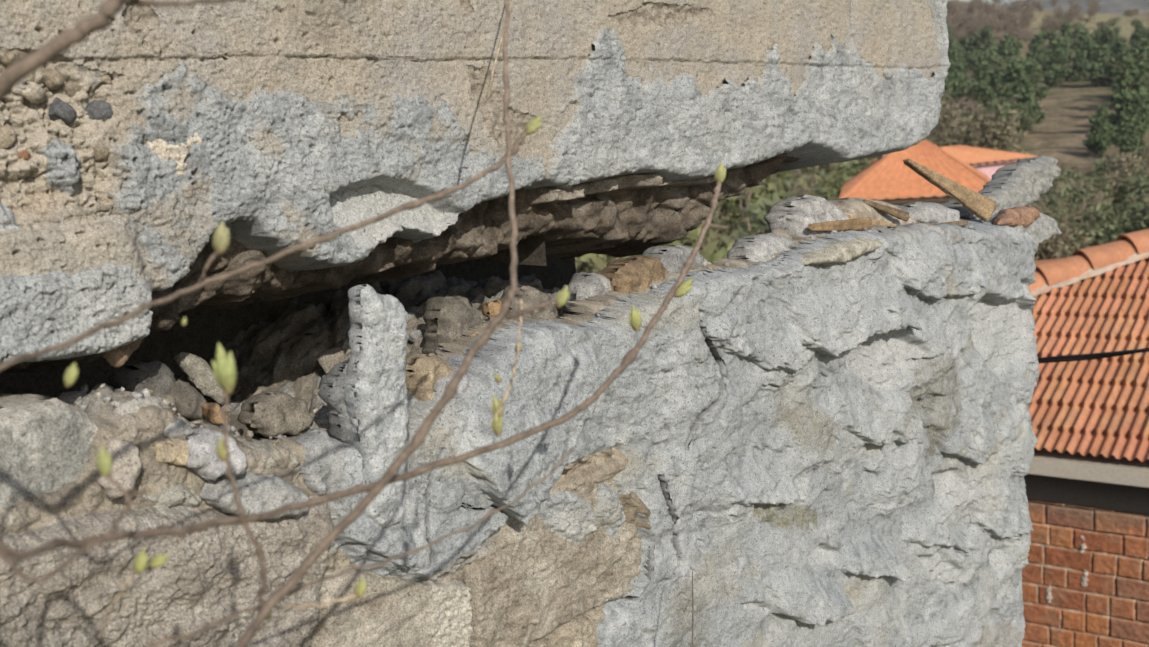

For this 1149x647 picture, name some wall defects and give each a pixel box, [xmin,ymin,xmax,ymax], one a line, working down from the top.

peeling [0,0,951,368]
spalling [405,353,454,401]
crack [416,434,519,579]
crack [527,313,728,647]